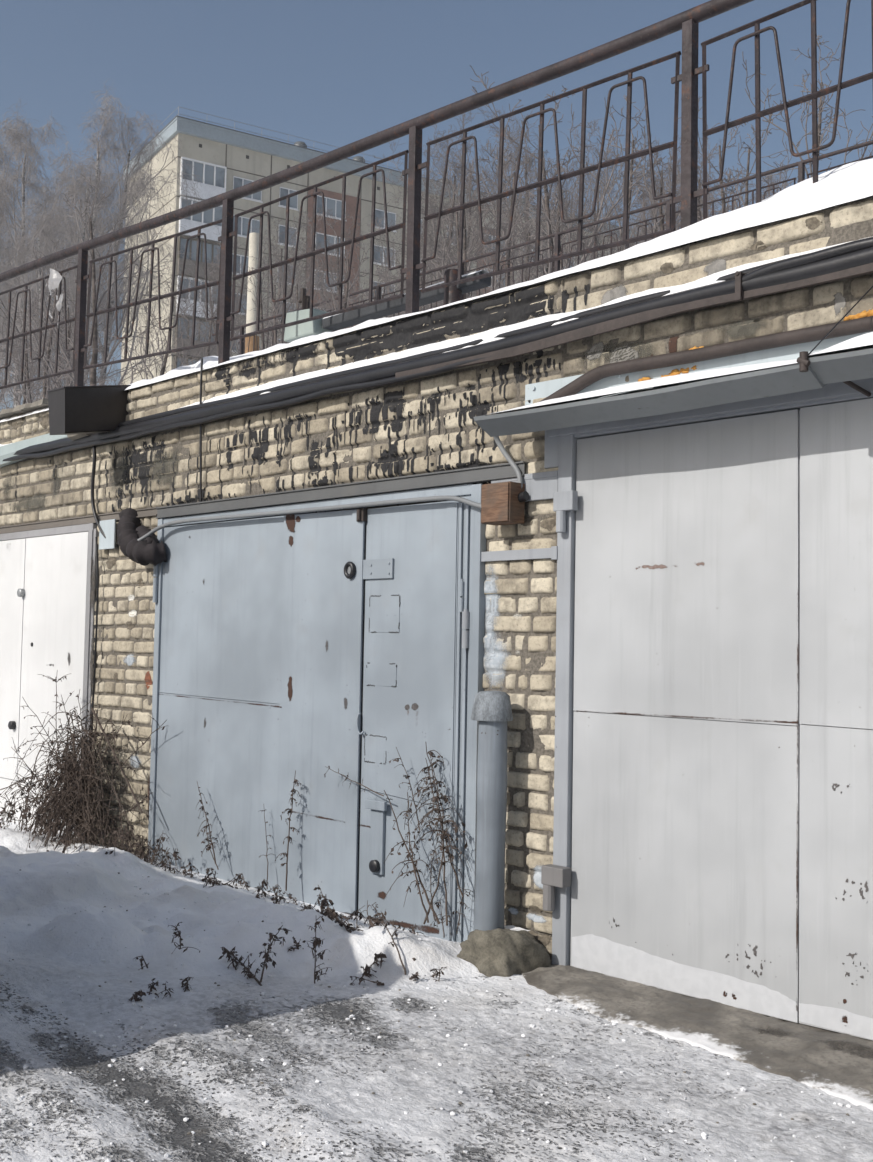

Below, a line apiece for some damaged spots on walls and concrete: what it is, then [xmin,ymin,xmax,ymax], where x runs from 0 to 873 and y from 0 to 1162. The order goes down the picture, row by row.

water stain [215,283,590,394]
rust [668,336,679,353]
water stain [101,350,561,512]
rust [286,514,301,547]